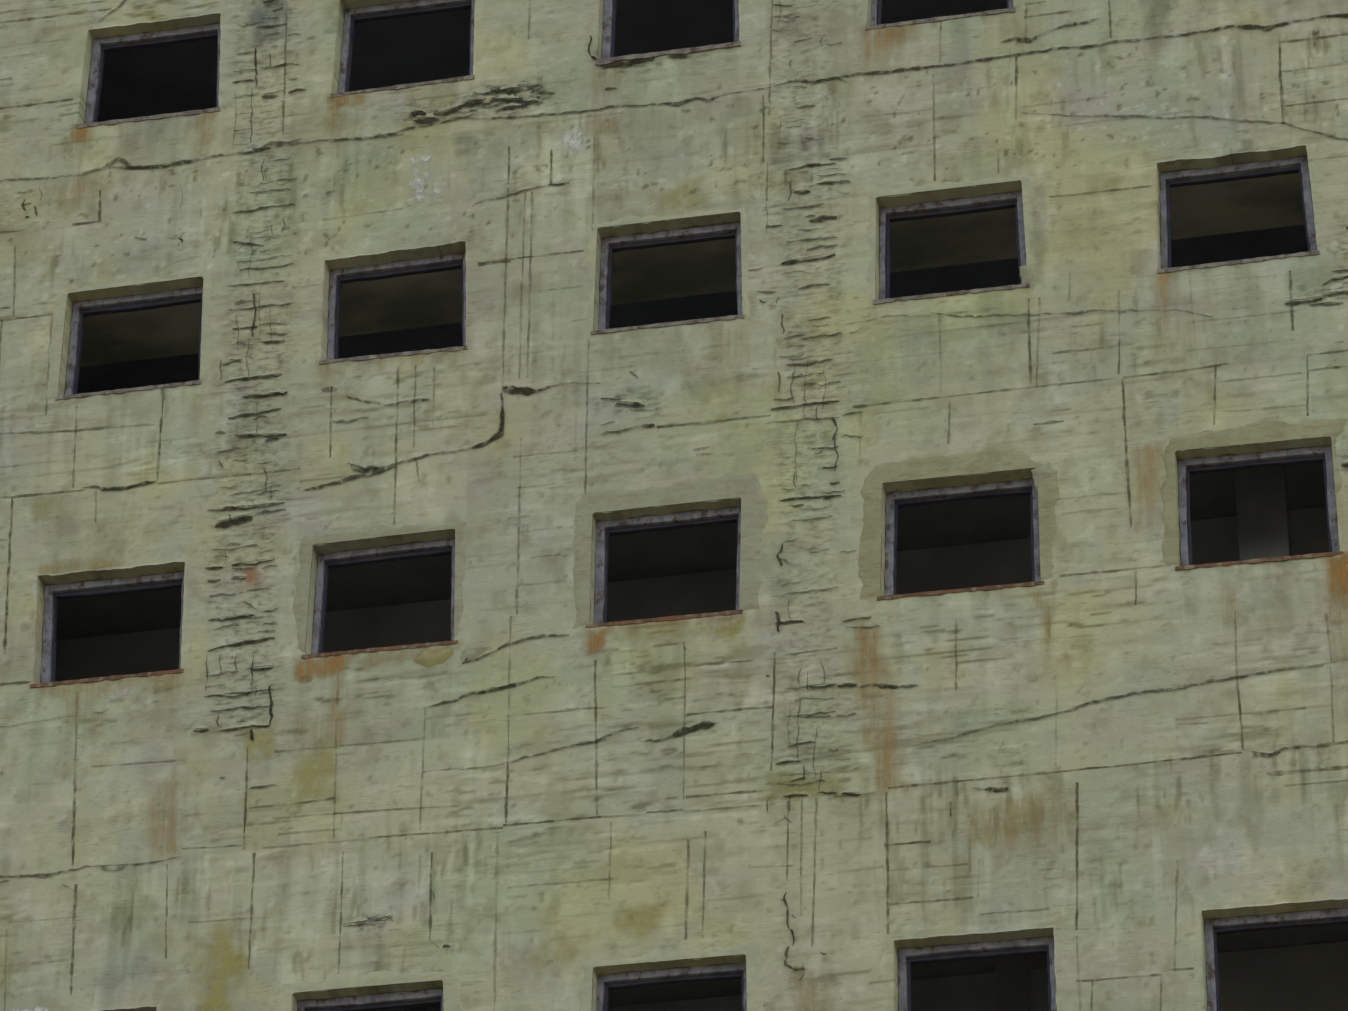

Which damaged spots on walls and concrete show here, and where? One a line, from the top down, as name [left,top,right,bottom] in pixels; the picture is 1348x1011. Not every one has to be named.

crack [493,13,1348,119]
crack [5,119,459,181]
spalling [411,84,555,125]
crack [1112,115,1348,141]
spalling [766,157,850,265]
spalling [215,48,306,468]
crack [332,396,429,423]
crack [472,385,557,449]
spalling [755,291,864,520]
crack [305,452,440,491]
spalling [207,483,286,528]
spalling [193,543,277,741]